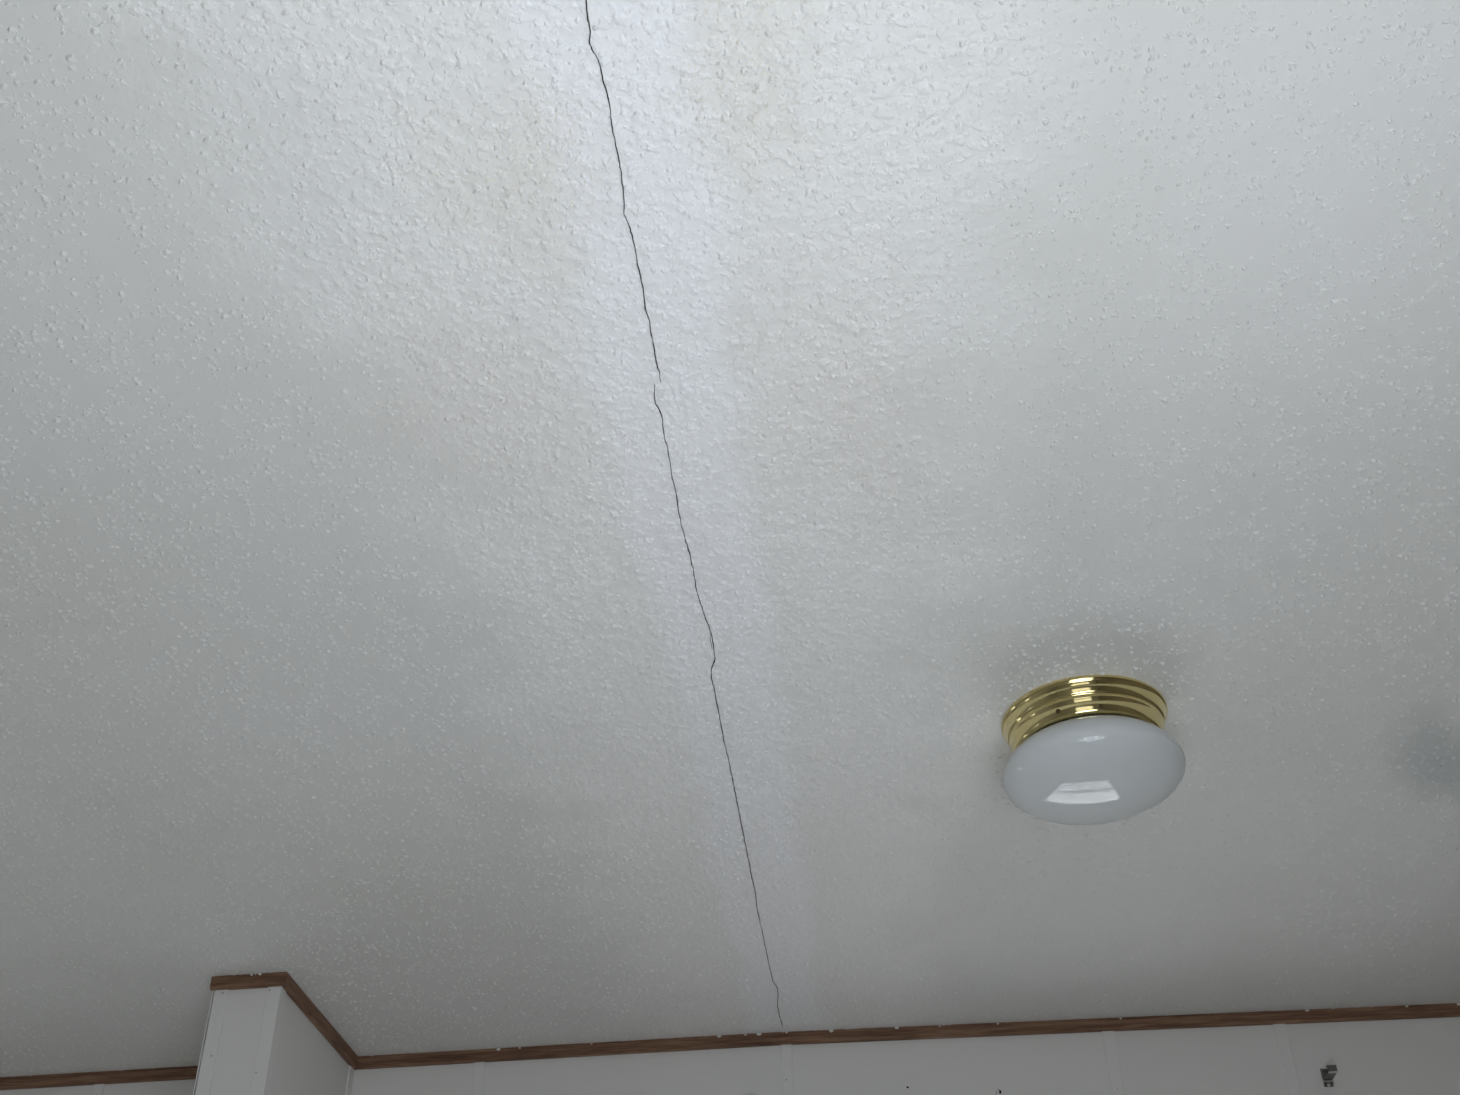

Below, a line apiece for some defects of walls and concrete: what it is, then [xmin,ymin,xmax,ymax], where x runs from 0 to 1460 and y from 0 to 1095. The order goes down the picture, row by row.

crack [585,0,783,1026]